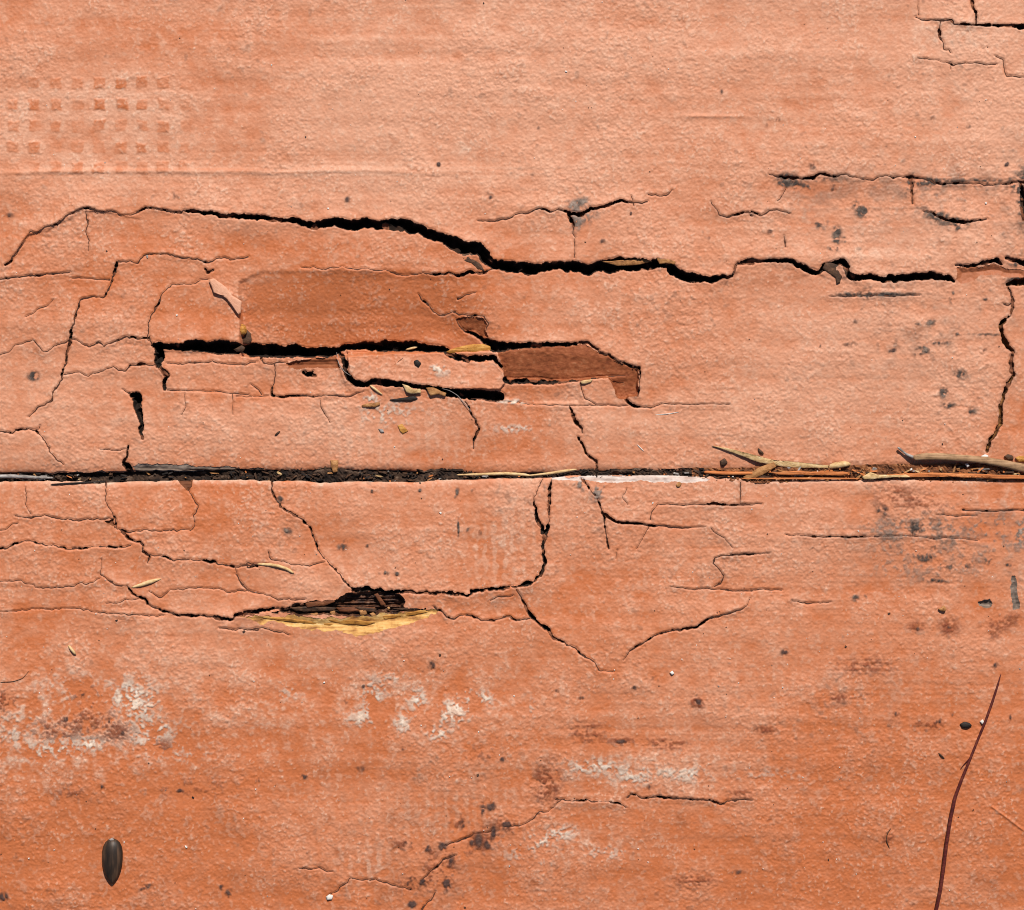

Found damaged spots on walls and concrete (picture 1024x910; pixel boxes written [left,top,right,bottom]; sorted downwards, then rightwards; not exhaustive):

crack [915,0,1024,78]
peeling [457,316,488,338]
peeling [498,344,640,399]
crack [0,172,1024,672]
spalling [272,589,426,617]
crack [303,793,753,910]